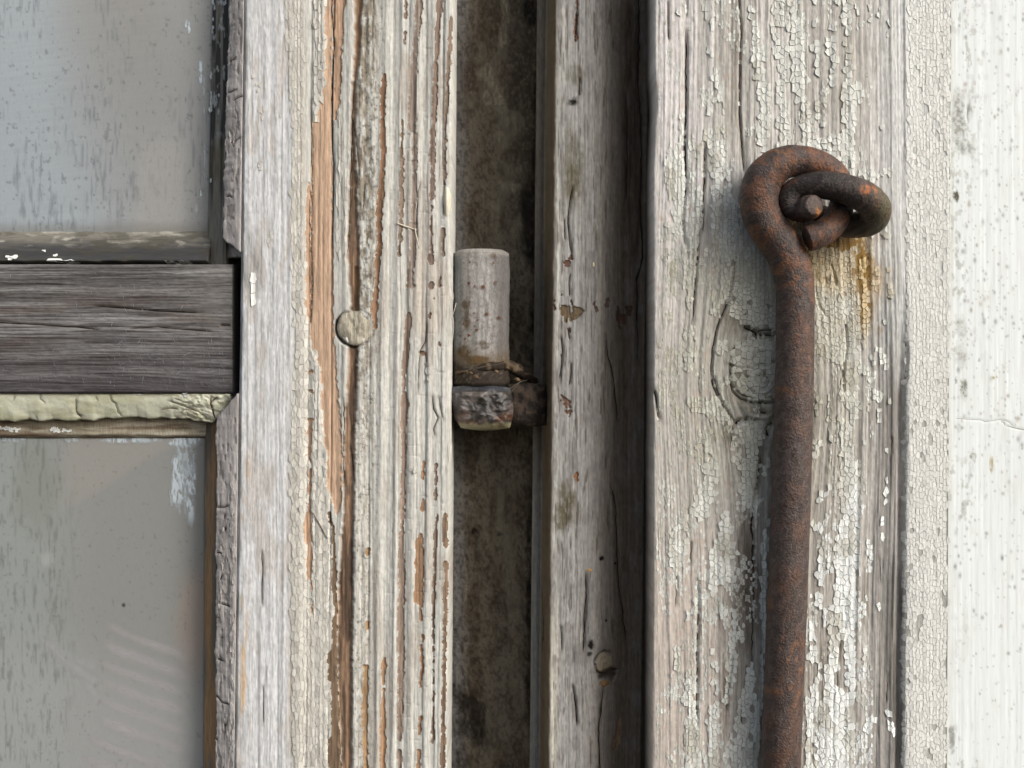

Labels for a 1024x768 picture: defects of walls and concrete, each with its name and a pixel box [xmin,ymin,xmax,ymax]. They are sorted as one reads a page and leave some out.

crack [161,397,217,418]
peeling [280,0,348,768]
peeling [370,73,387,329]
peeling [361,312,449,768]
peeling [397,0,453,300]
rust [458,301,501,364]
peeling [664,46,776,768]
peeling [748,0,893,183]
rust [824,236,872,324]
peeling [803,246,896,768]